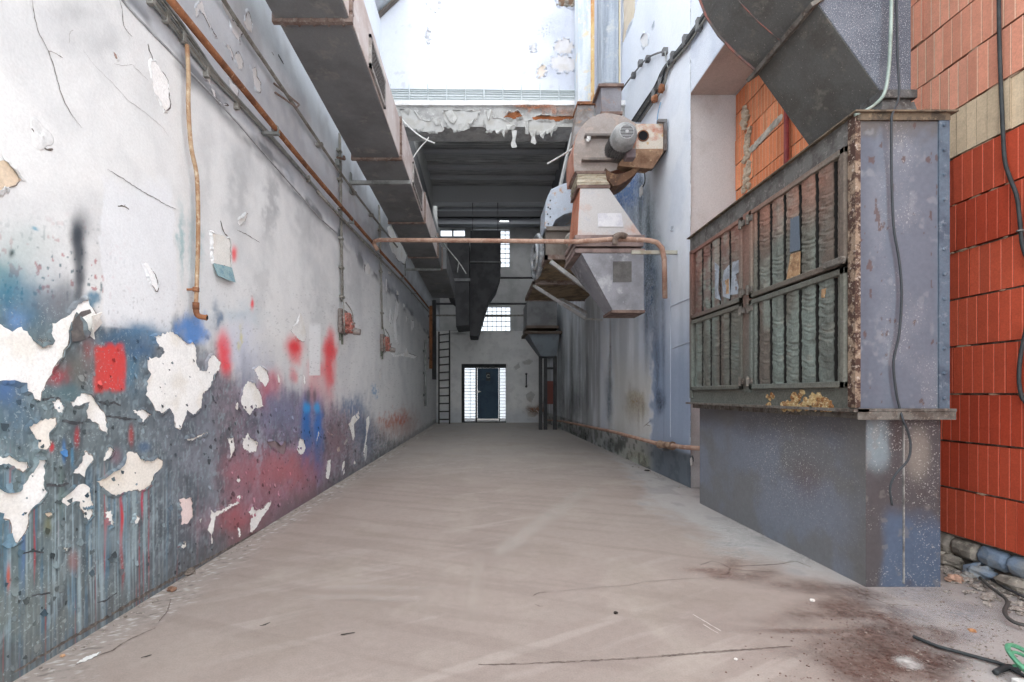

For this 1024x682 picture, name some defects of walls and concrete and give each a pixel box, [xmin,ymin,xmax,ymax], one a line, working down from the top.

crack [32,1,168,135]
peeling [148,58,171,114]
peeling [529,36,575,79]
peeling [399,108,574,148]
crack [108,169,175,209]
peeling [0,295,398,578]
peeling [5,577,80,626]